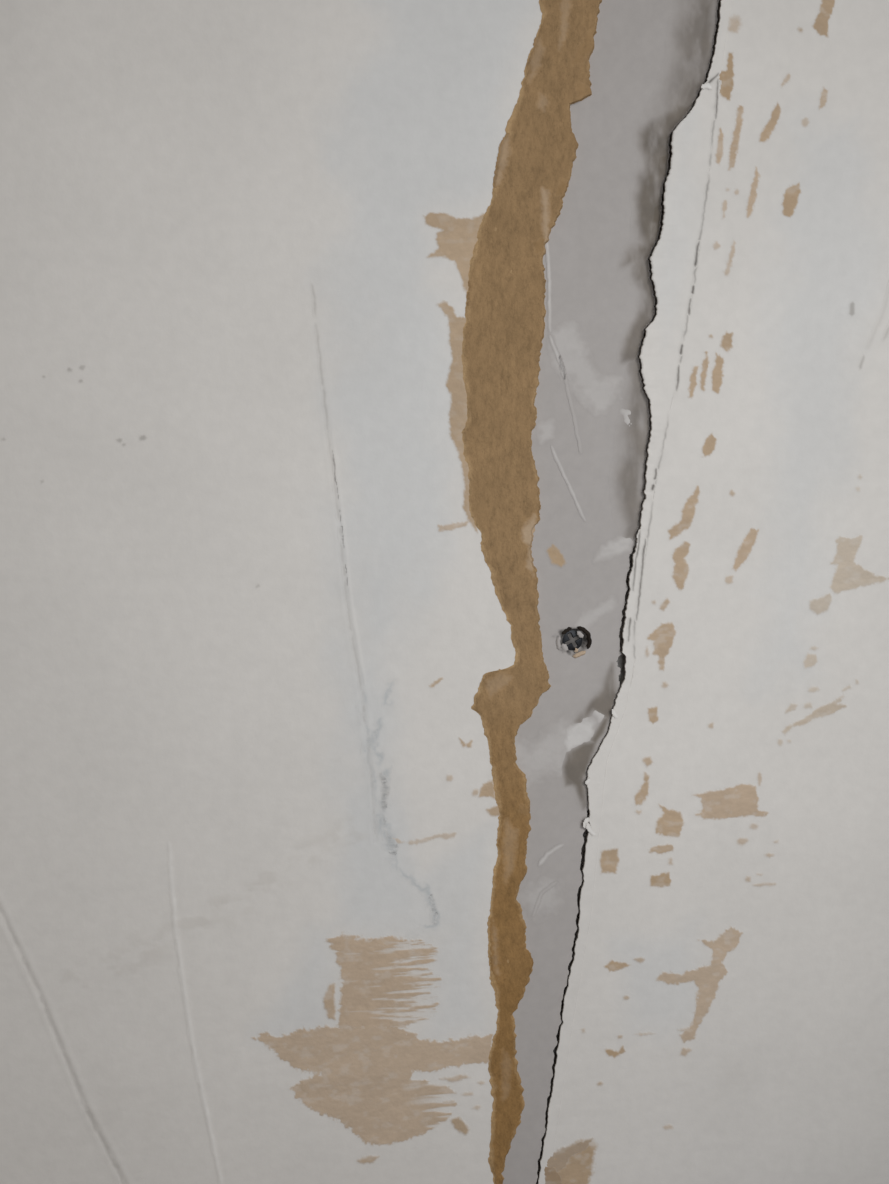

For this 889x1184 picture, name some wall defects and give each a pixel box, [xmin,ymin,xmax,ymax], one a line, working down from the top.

peeling [796,0,836,39]
peeling [250,0,745,1184]
peeling [808,534,889,616]
peeling [633,755,770,889]